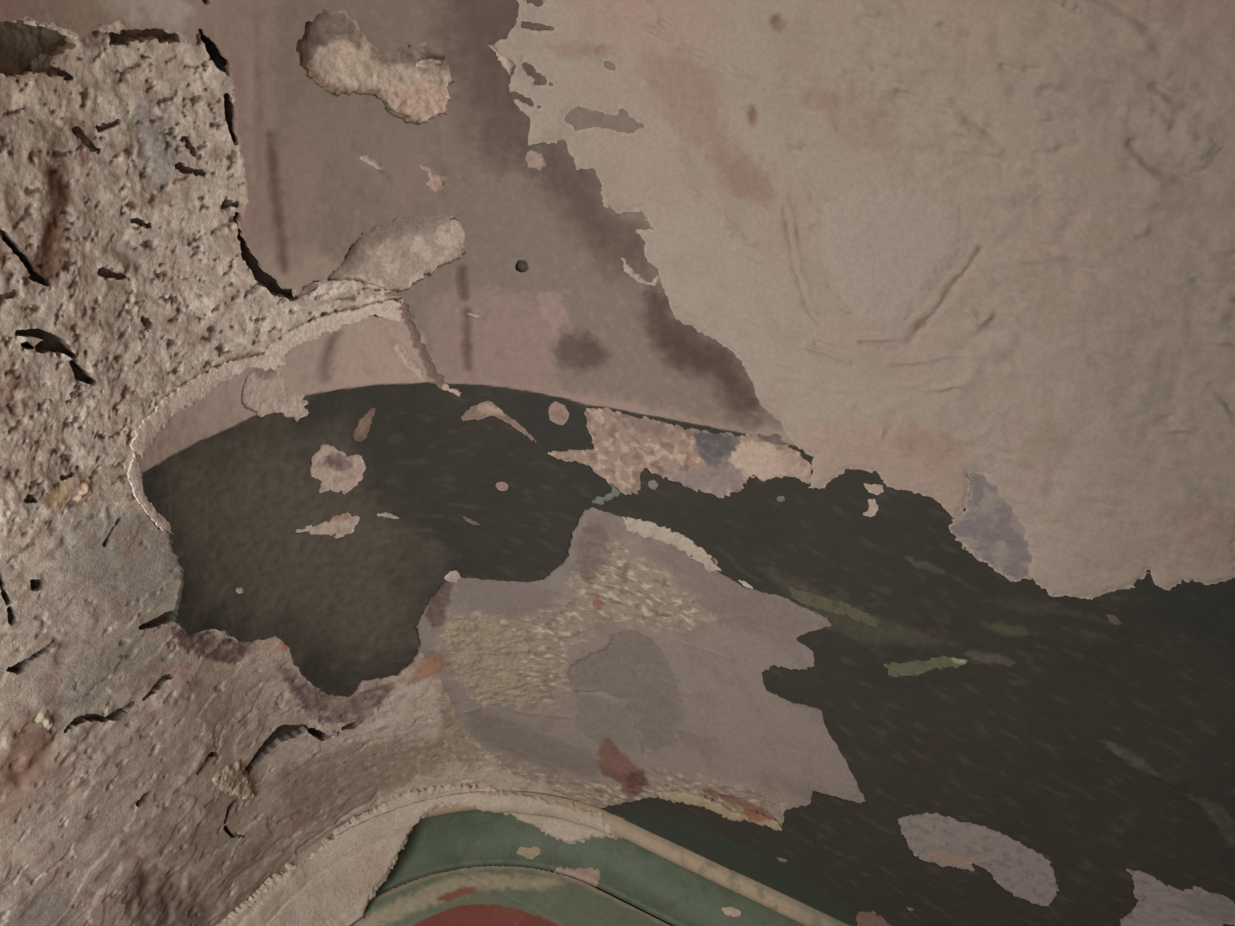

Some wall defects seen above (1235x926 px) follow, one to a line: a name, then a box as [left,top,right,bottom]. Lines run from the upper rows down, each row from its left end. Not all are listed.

damp [652,295,756,408]
flaking render [0,9,879,926]
peeling [897,812,1059,906]
peeling [1119,869,1235,926]